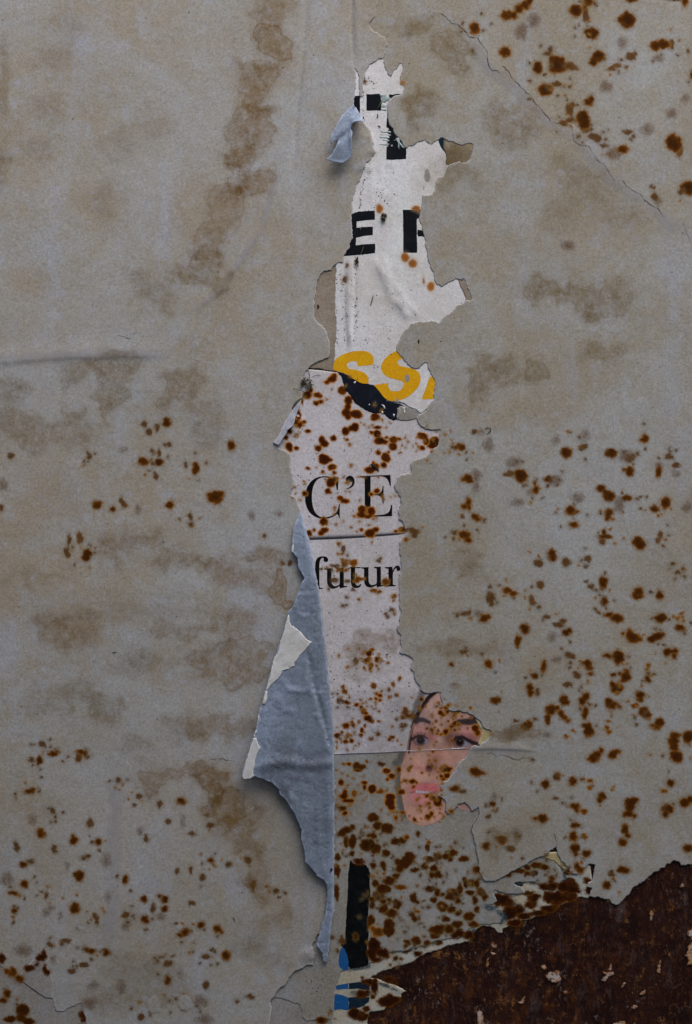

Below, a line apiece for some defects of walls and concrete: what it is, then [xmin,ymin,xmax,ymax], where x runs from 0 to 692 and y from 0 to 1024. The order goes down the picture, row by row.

peeling [326,105,363,163]
peeling [443,139,473,165]
crack [442,14,687,233]
corrosion [527,0,649,157]
peeling [309,265,337,372]
corrosion [284,373,477,543]
corrosion [555,485,690,550]
peeling [242,512,335,963]
corrosion [453,548,692,818]
corrosion [316,647,630,1024]
corrosion [0,937,111,1024]
peeling [541,965,570,994]